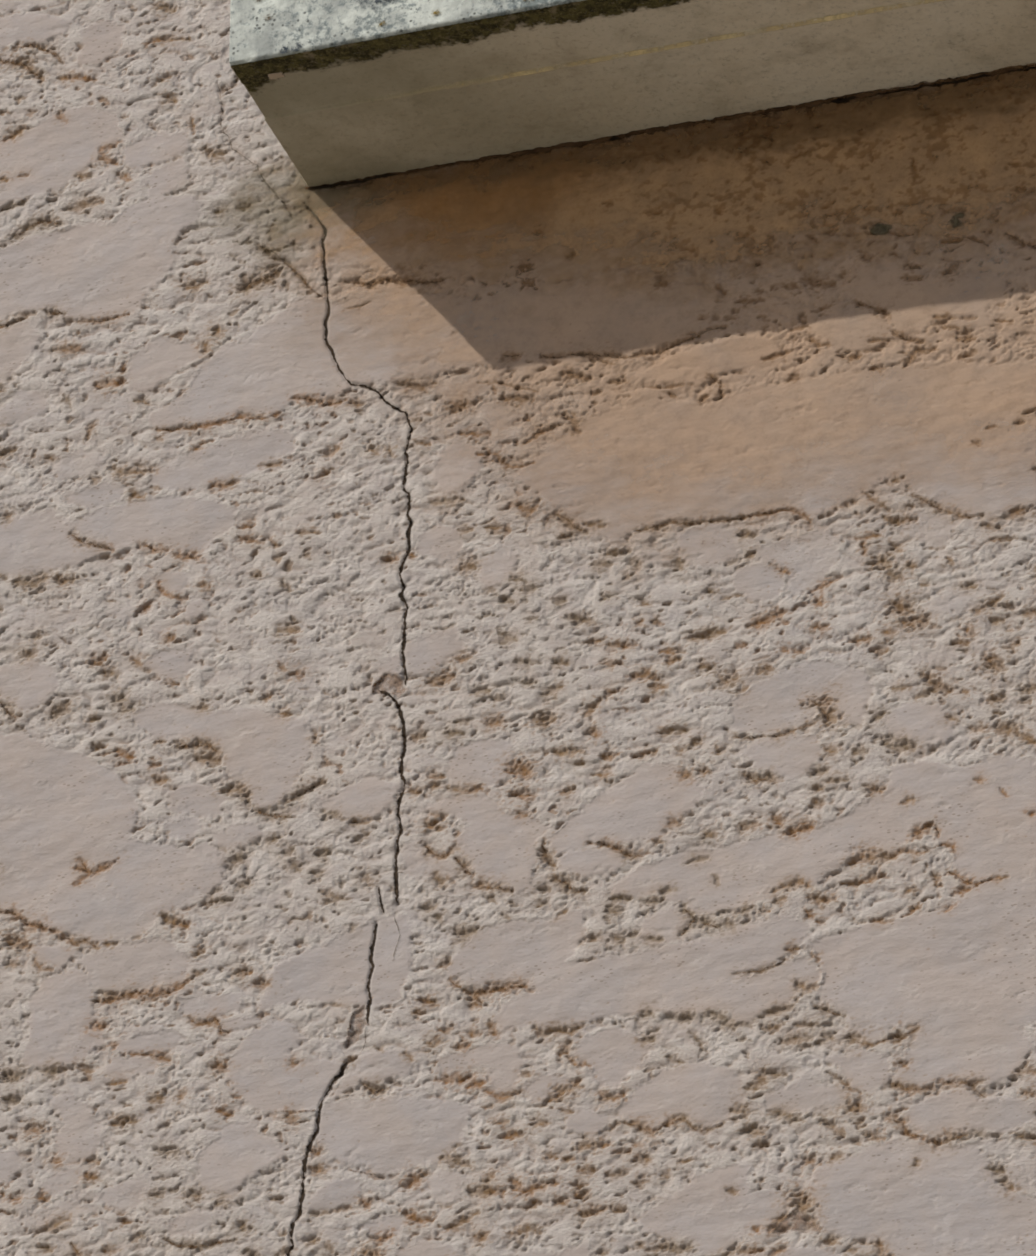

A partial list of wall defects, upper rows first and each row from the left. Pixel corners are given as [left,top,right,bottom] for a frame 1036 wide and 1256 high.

crack [217,77,413,1256]